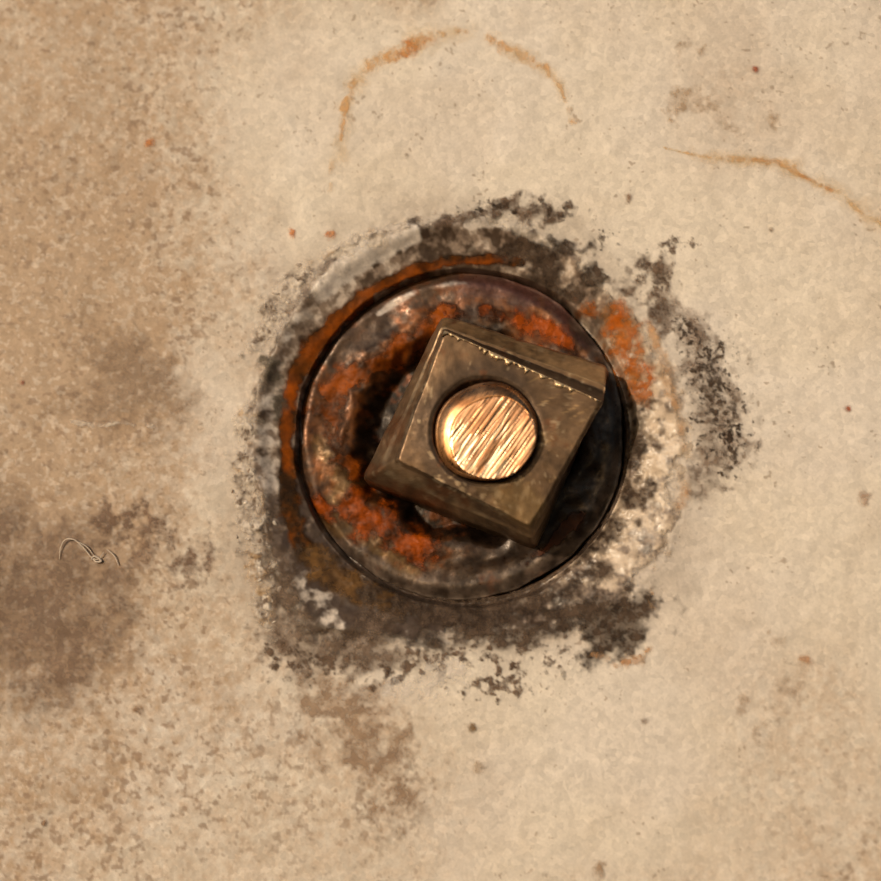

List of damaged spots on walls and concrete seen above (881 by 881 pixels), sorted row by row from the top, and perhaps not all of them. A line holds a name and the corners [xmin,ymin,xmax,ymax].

corrosion [366,38,418,70]
corrosion [340,96,349,140]
leakage [436,192,573,229]
leakage [496,230,604,302]
leakage [259,355,287,420]
corrosion [278,253,582,618]
corrosion [578,300,660,403]
leakage [621,401,661,526]
leakage [620,237,750,481]
leakage [263,517,662,705]